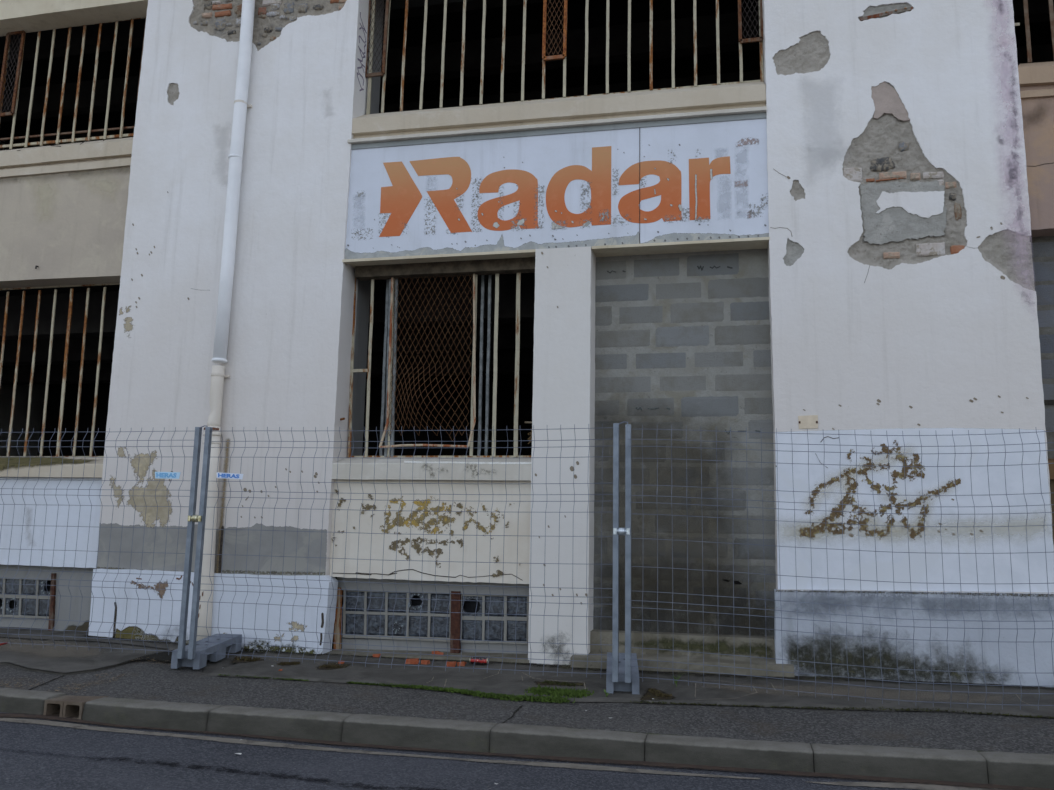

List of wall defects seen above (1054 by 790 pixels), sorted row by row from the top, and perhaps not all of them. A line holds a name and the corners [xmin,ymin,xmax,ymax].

flaking render [190,0,347,51]
flaking render [858,3,913,21]
flaking render [772,31,831,75]
flaking render [167,83,180,105]
flaking render [842,82,1035,291]
flaking render [783,239,804,266]
peeling [109,446,173,528]
peeling [360,494,511,568]
peeling [130,580,169,599]
leakage [489,645,607,671]
leakage [639,634,1054,690]